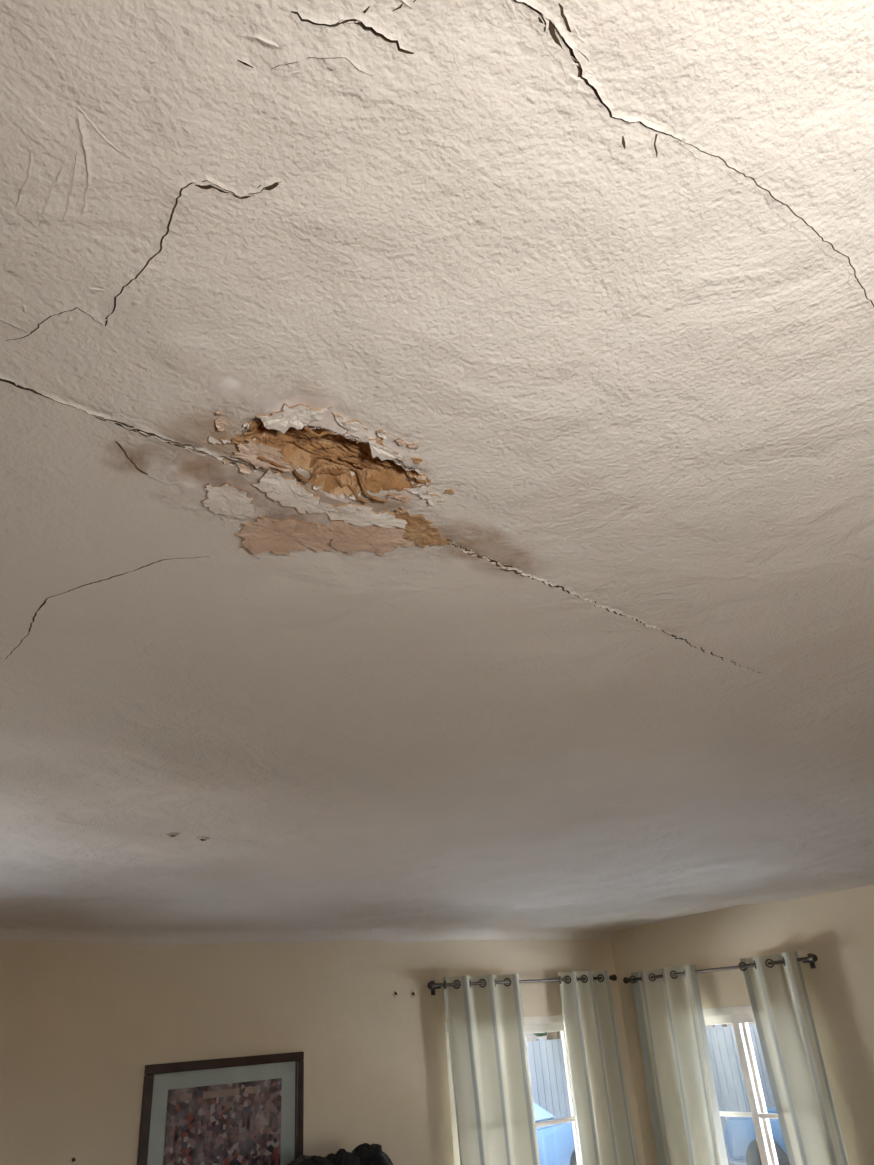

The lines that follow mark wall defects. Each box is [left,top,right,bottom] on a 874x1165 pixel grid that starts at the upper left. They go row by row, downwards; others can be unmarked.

crack [237,0,422,81]
crack [499,0,874,325]
crack [0,173,283,489]
flaking render [165,391,455,556]
crack [2,554,212,660]
crack [430,525,761,673]